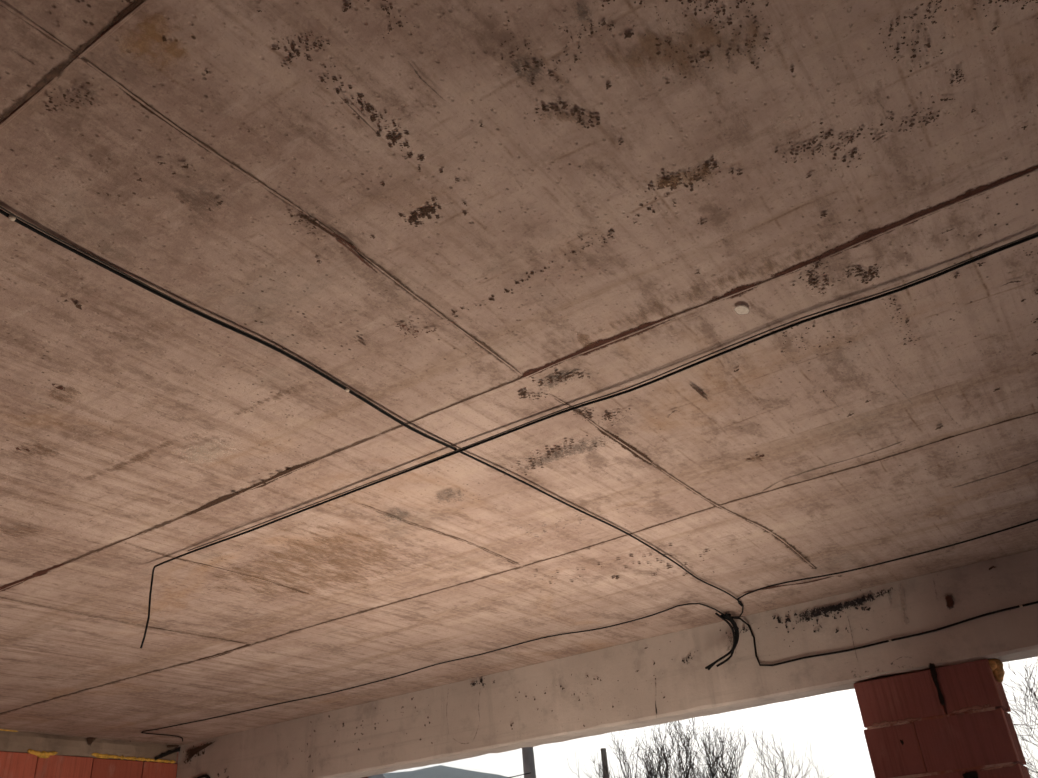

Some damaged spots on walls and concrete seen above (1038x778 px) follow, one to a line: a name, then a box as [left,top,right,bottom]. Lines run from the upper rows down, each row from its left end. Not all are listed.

water stain [272,32,330,69]
water stain [500,0,782,85]
water stain [879,0,956,77]
water stain [318,66,425,172]
water stain [527,101,600,129]
water stain [775,96,955,171]
water stain [645,158,743,205]
water stain [398,198,442,227]
corrosion [774,165,1038,277]
corrosion [711,282,761,302]
water stain [772,587,893,647]